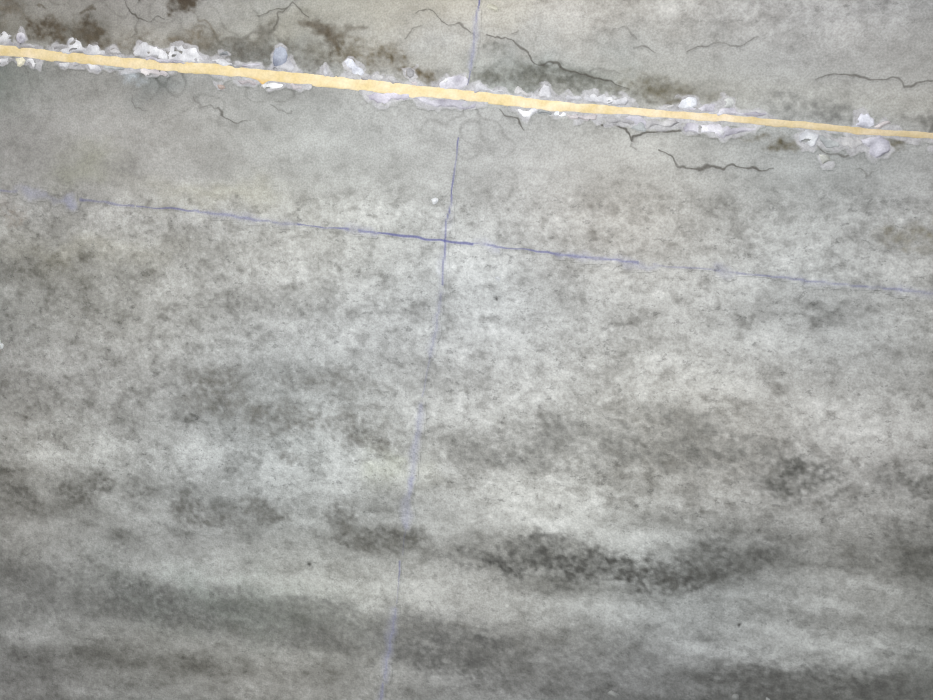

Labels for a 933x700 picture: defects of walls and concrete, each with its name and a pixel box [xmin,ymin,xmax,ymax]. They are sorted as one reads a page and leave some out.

crack [256,0,310,29]
crack [404,8,630,90]
water stain [460,30,733,109]
crack [685,36,761,53]
crack [814,73,933,89]
crack [499,108,525,132]
water stain [735,86,933,155]
crack [600,125,775,173]
crack [809,139,874,178]
water stain [890,139,919,158]
water stain [150,357,413,470]
water stain [0,391,933,613]